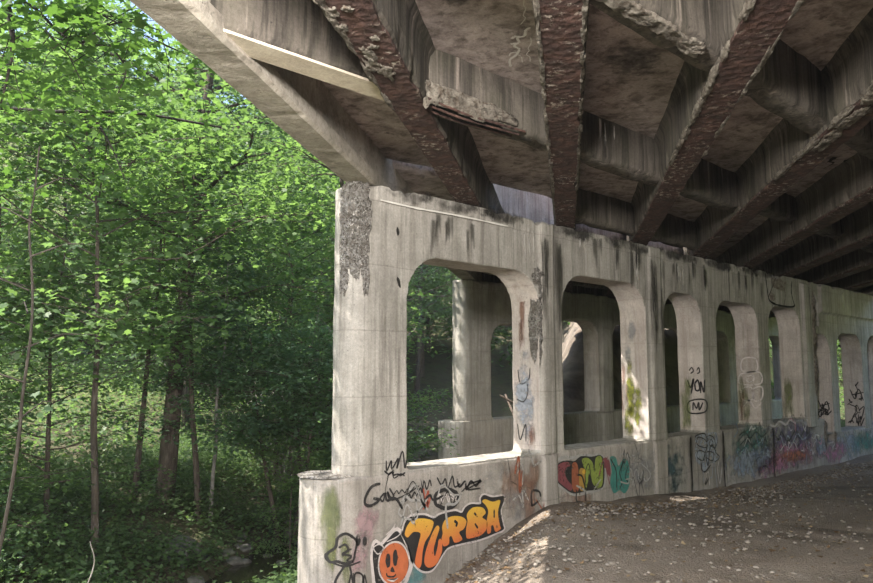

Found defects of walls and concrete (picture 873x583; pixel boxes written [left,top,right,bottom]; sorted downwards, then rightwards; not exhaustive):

corrosion [328,5,355,33]
corrosion [358,35,396,83]
spalling [339,181,373,297]
spalling [528,267,545,365]